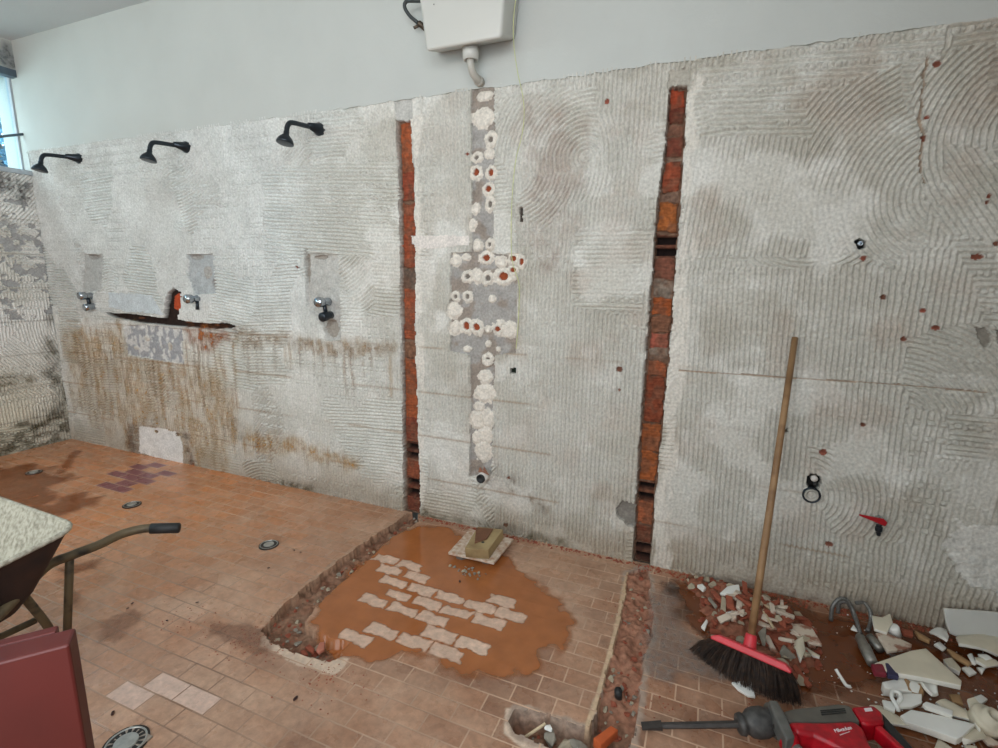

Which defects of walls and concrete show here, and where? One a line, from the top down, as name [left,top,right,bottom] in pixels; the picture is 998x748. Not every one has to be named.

spalling [973,326,998,348]